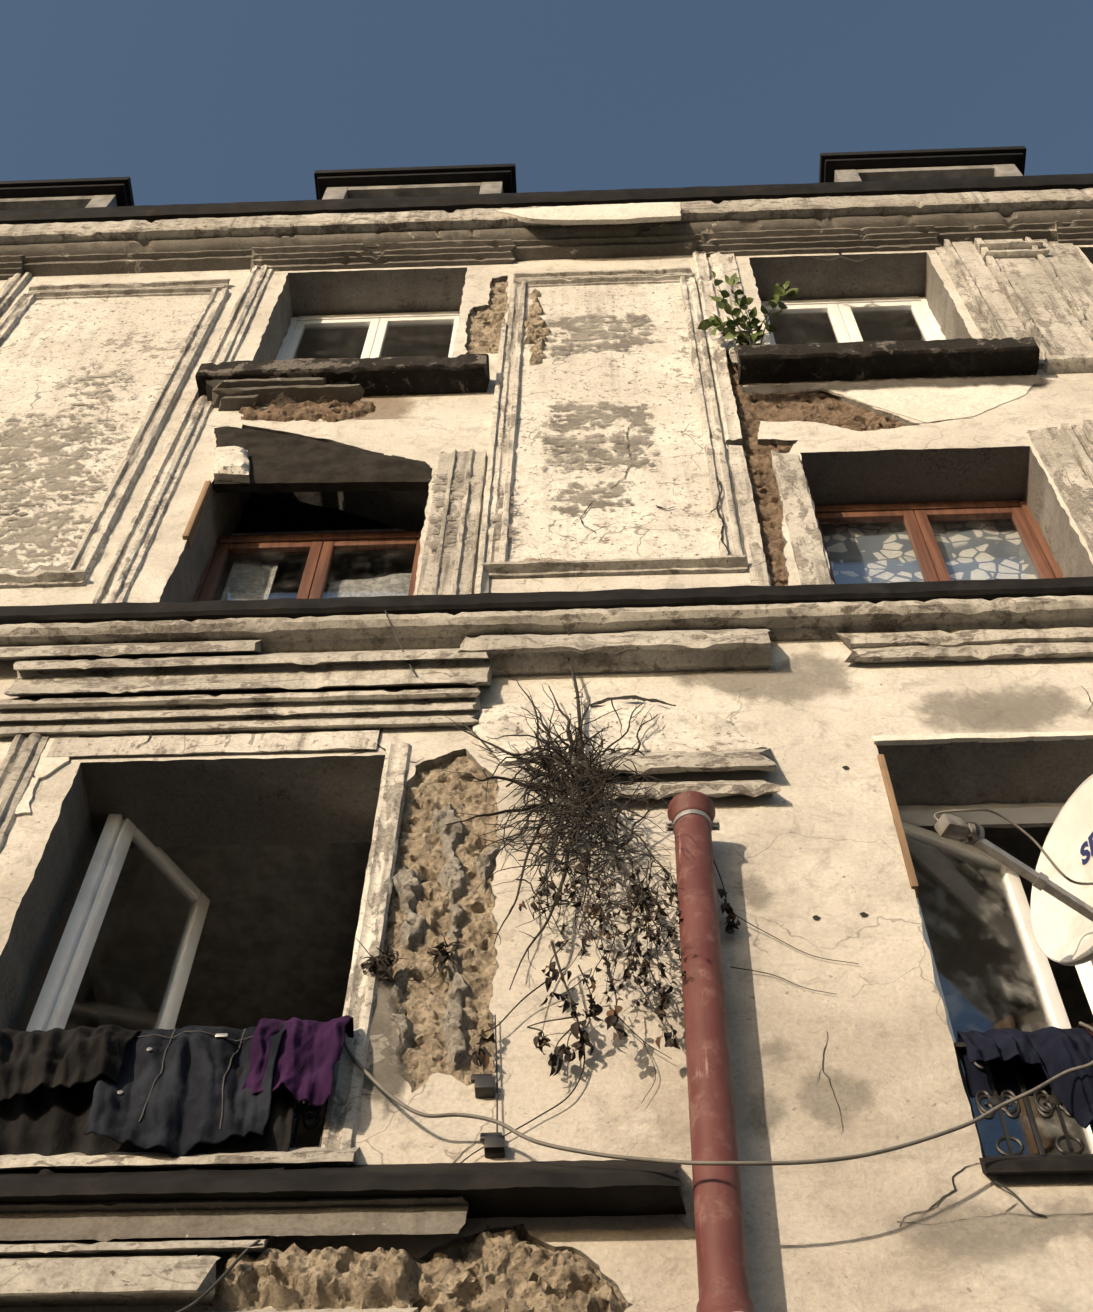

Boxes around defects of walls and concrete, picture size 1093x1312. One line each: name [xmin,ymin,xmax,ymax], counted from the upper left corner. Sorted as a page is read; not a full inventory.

spalling [466,280,509,354]
peeling [524,289,657,366]
spalling [238,399,376,422]
peeling [0,362,136,585]
crack [574,427,632,534]
crack [710,476,730,563]
spalling [726,354,911,586]
damp [678,655,845,700]
damp [920,691,1074,728]
spalling [365,755,500,1092]
spalling [202,1229,628,1312]